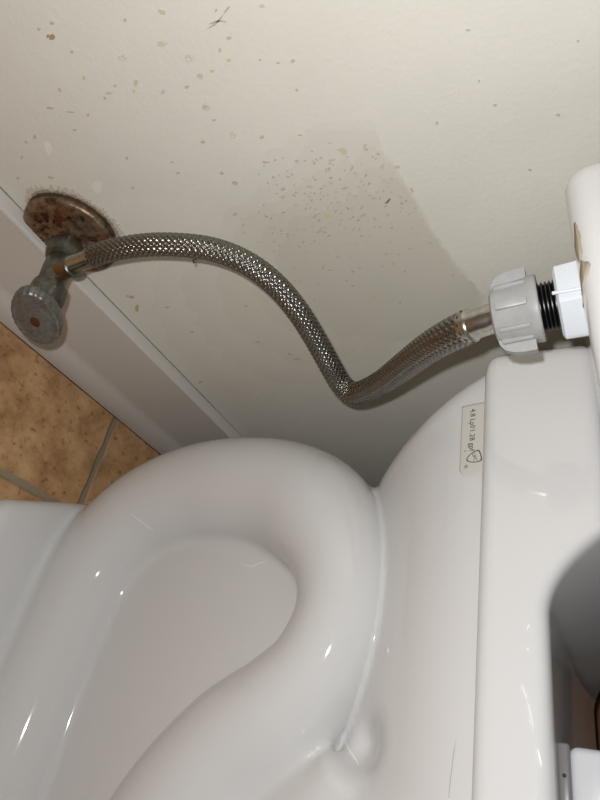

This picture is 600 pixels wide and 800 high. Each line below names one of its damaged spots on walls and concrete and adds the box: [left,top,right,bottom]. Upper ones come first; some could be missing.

damp [183,119,489,382]